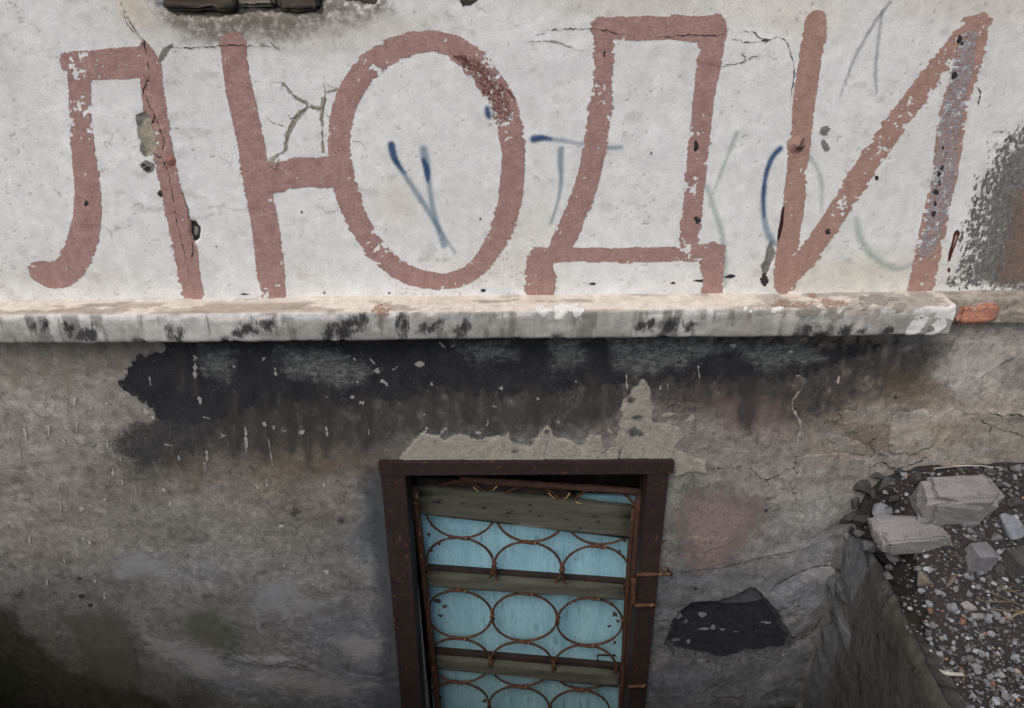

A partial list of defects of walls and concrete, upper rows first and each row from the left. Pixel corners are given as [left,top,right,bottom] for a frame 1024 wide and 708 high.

crack [662,30,796,103]
peeling [135,111,156,173]
crack [121,7,193,285]
crack [268,82,338,170]
peeling [859,125,1024,415]
peeling [399,379,707,476]
crack [708,383,805,518]
crack [868,437,933,472]
crack [970,413,1024,437]
crack [675,500,832,592]
spalling [664,587,796,666]